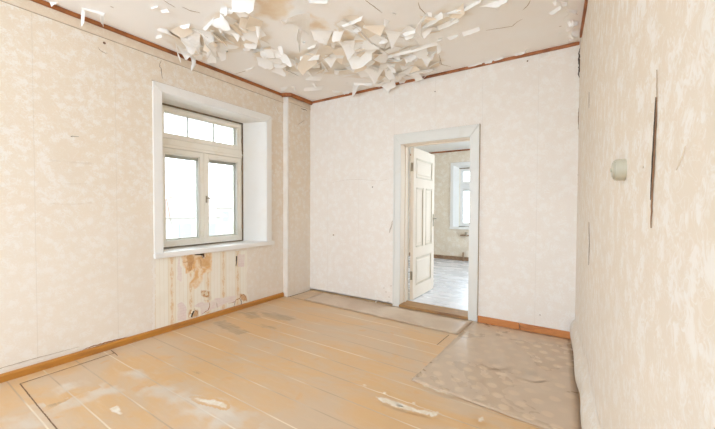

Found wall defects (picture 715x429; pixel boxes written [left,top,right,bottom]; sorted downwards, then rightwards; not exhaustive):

peeling [149,0,507,97]
crack [643,97,656,200]